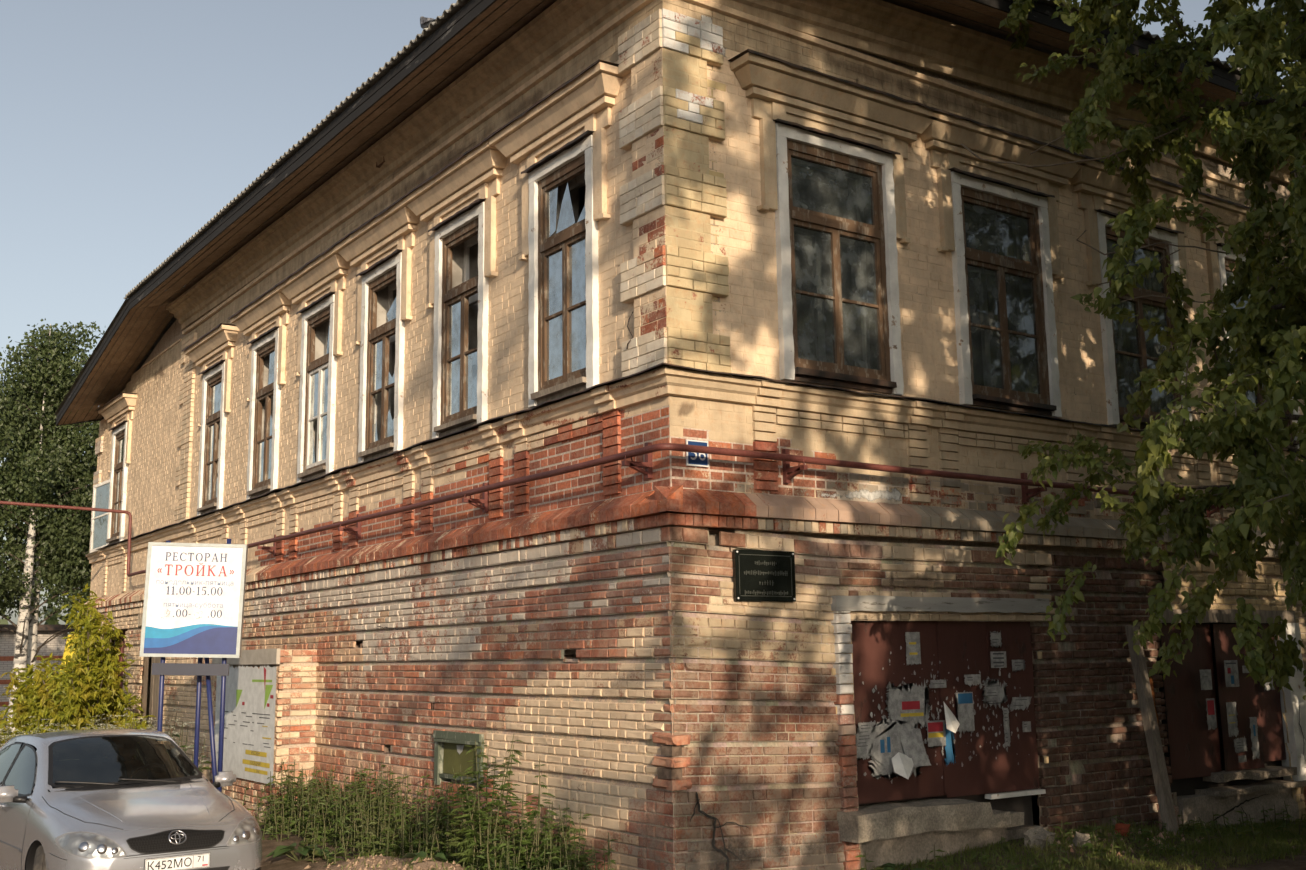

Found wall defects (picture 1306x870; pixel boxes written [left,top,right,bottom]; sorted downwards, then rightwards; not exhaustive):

peeling [660,8,724,55]
peeling [676,89,713,125]
peeling [632,135,665,178]
peeling [637,215,670,273]
peeling [640,297,667,340]
peeling [255,407,837,566]
peeling [320,526,746,791]